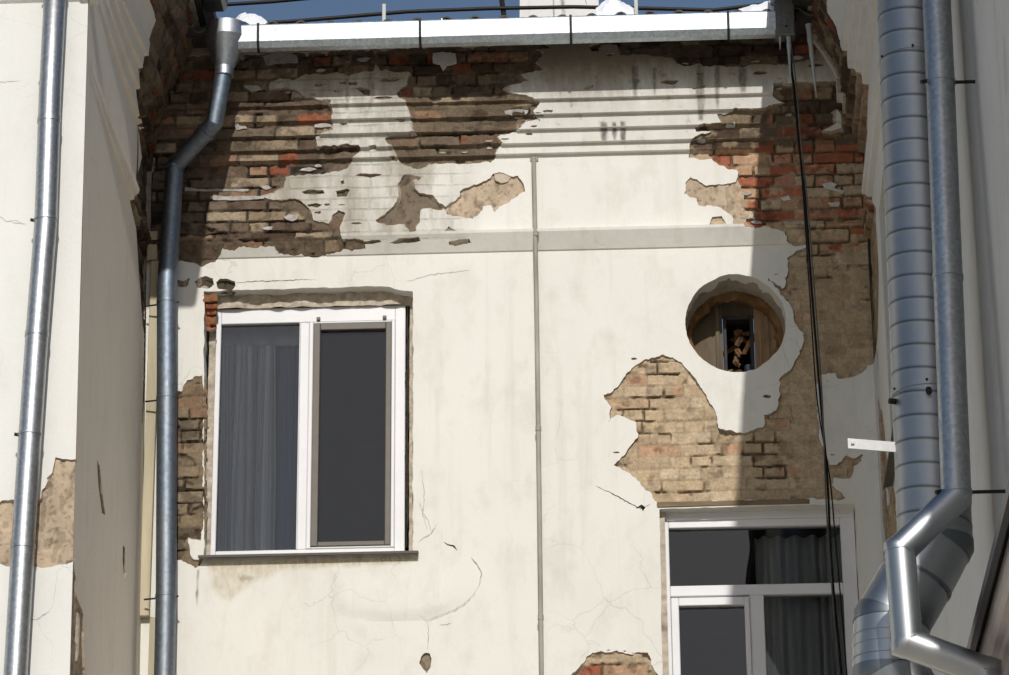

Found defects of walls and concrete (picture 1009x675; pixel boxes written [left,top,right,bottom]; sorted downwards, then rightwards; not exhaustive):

spalling [130,0,215,325]
spalling [179,44,550,267]
spalling [200,280,236,332]
spalling [590,0,879,502]
spalling [0,503,14,567]
spalling [34,459,75,568]
spalling [177,376,208,568]
crack [405,305,482,649]
crack [597,486,648,511]
spalling [880,410,897,540]
spalling [420,654,431,671]
spalling [577,651,657,675]